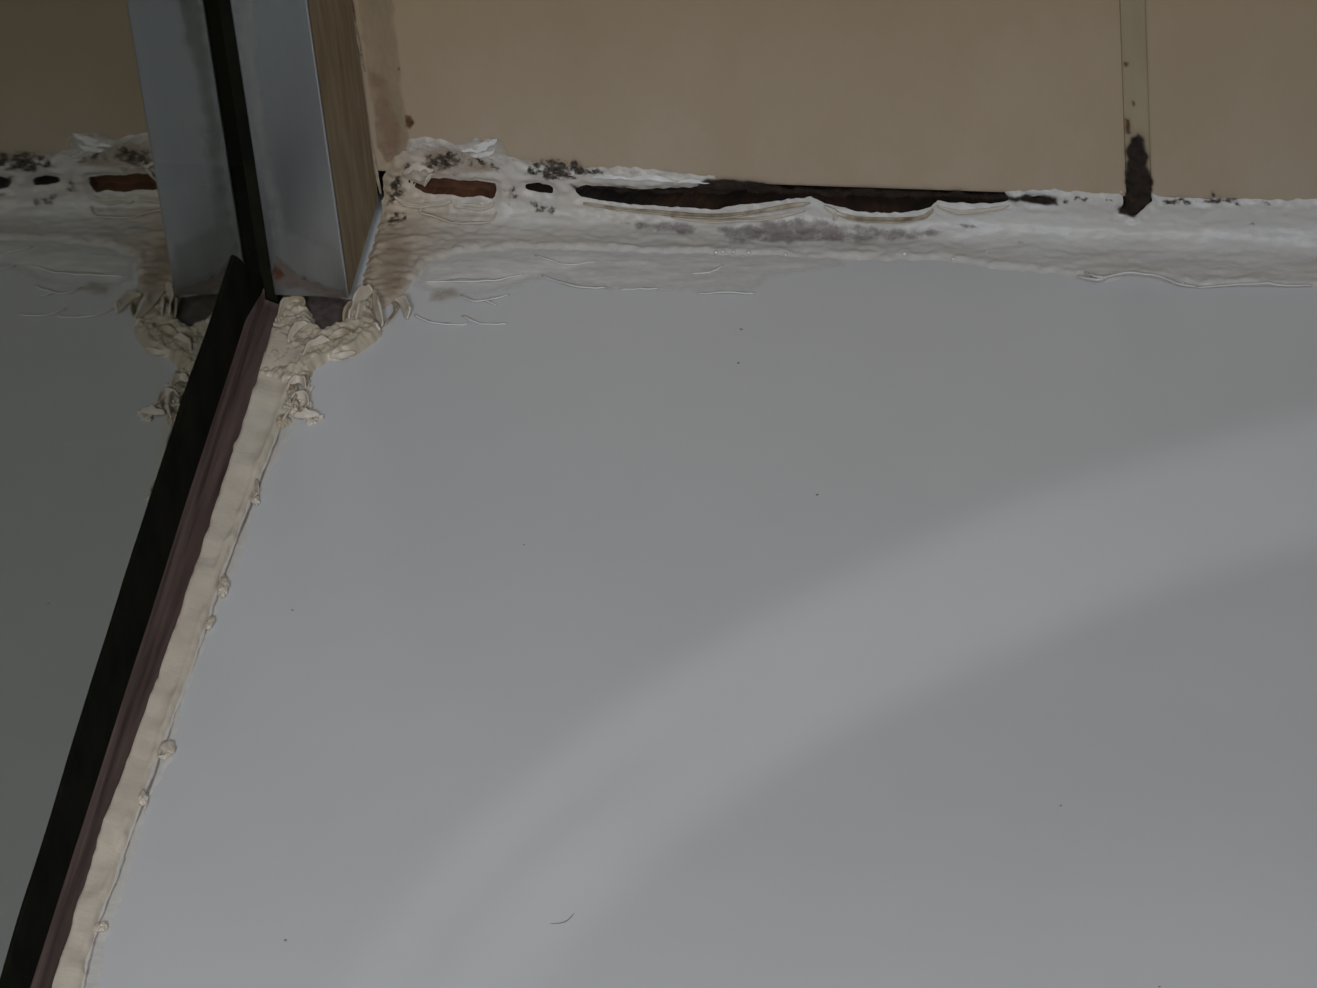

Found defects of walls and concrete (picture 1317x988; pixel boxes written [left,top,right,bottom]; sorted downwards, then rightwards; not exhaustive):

peeling [460,138,498,158]
peeling [402,163,434,187]
peeling [591,173,709,184]
leakage [1106,135,1238,217]